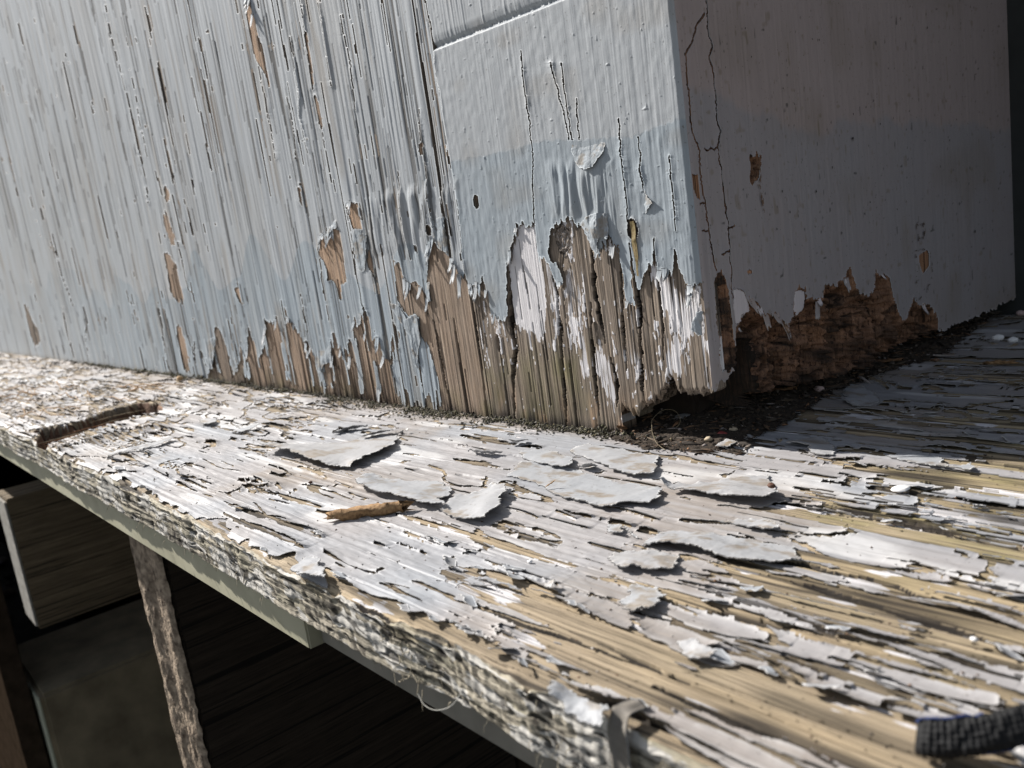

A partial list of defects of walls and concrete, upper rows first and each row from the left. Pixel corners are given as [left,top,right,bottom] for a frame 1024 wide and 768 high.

crack [684,1,735,296]
peeling [206,200,726,432]
spalling [733,267,938,394]
peeling [27,409,1024,768]